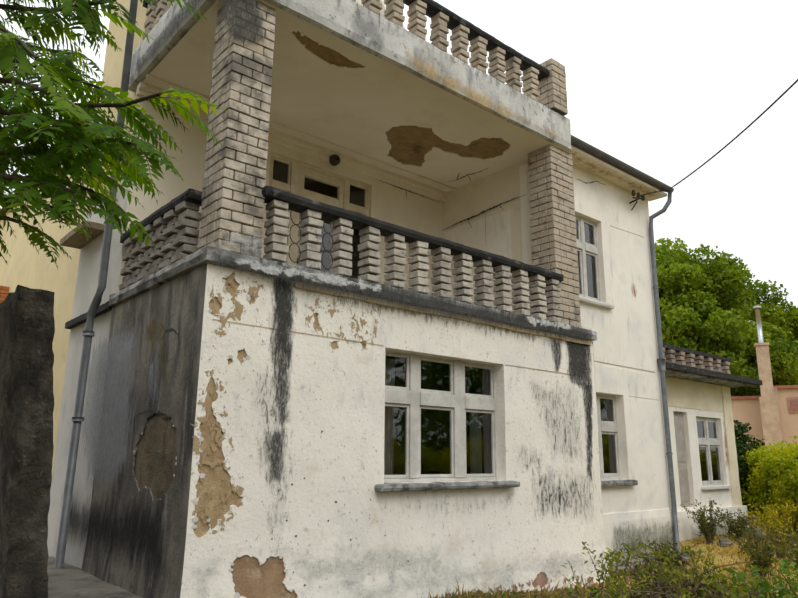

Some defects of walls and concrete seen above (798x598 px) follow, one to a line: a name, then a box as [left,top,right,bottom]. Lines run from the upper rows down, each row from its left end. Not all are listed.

crack [442,195,524,235]
peeling [208,273,264,337]
peeling [304,293,378,353]
leakage [216,233,592,512]
leakage [81,331,135,481]
peeling [191,357,245,538]
leakage [68,502,161,566]
peeling [229,555,297,598]